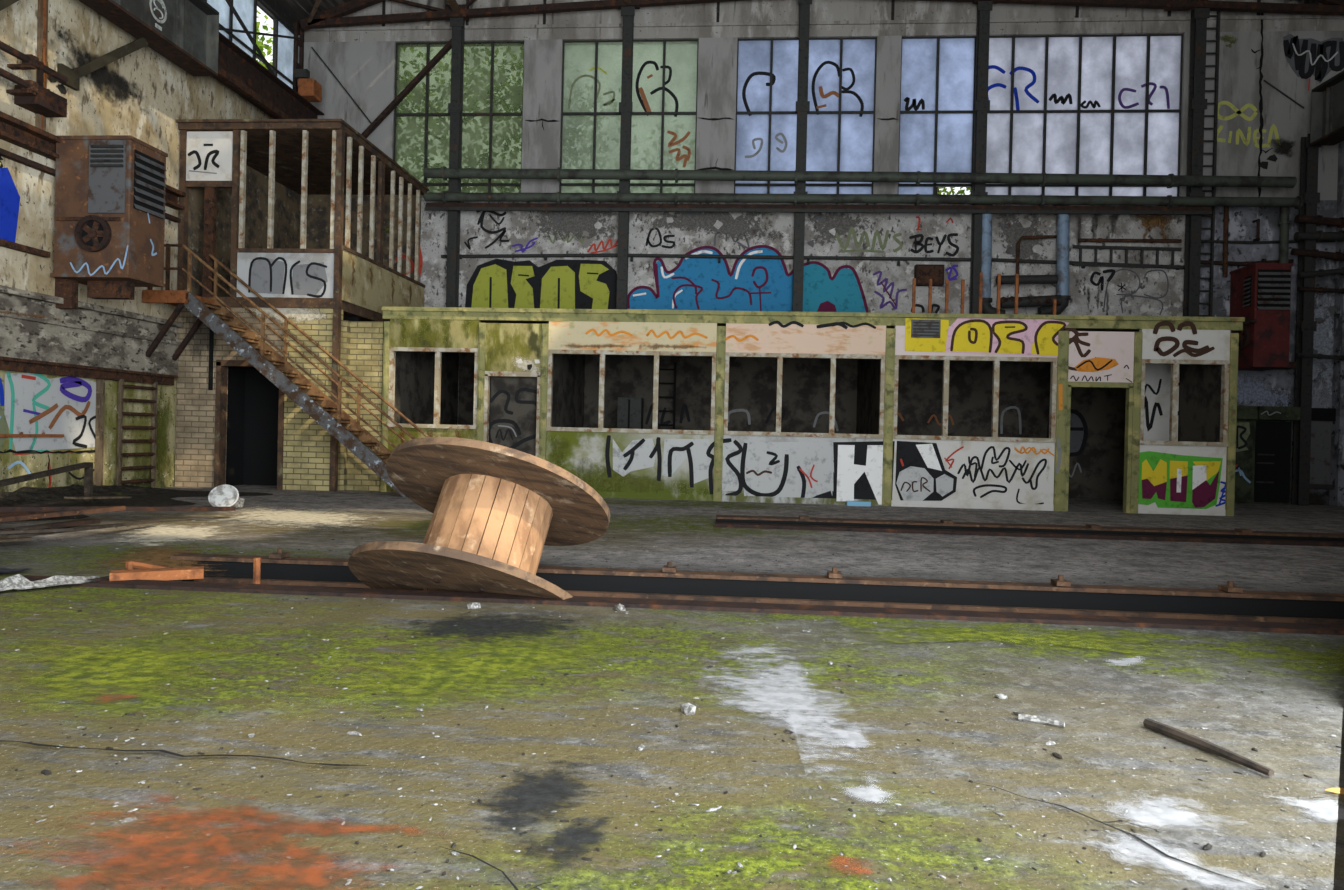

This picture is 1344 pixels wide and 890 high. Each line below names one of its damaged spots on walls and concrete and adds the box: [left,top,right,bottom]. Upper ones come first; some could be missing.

corrosion [63,796,417,890]